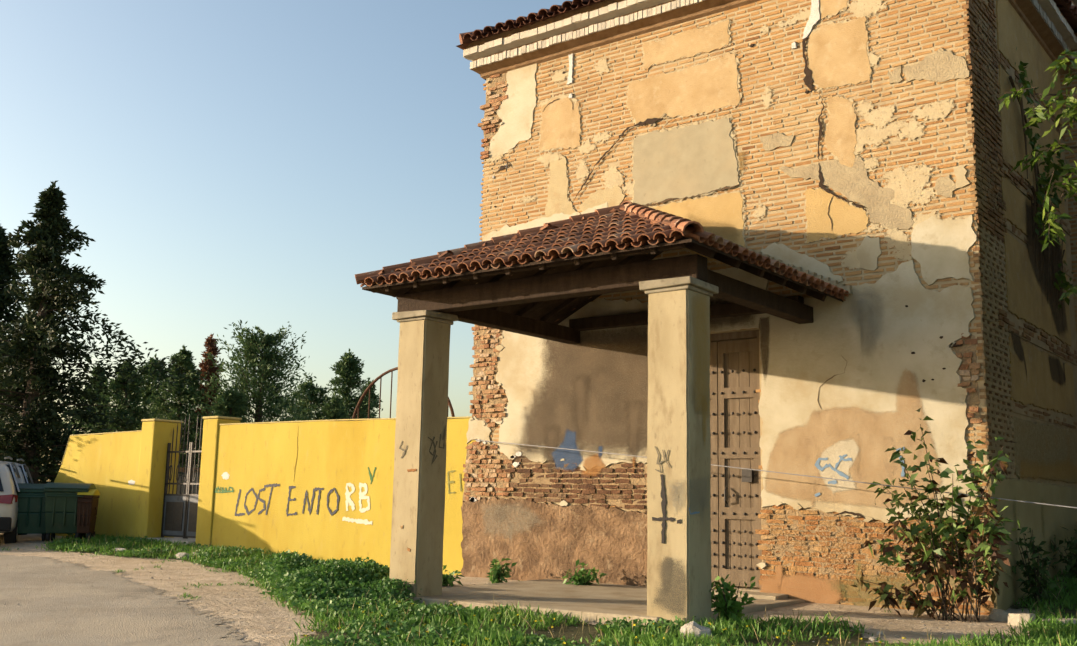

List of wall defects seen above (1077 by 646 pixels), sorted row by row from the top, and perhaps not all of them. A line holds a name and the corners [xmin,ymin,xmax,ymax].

spalling [478,73,508,161]
crack [574,113,672,214]
crack [802,37,866,229]
spalling [469,325,508,431]
spalling [463,439,647,514]
damp [661,557,673,594]
spalling [755,502,994,615]